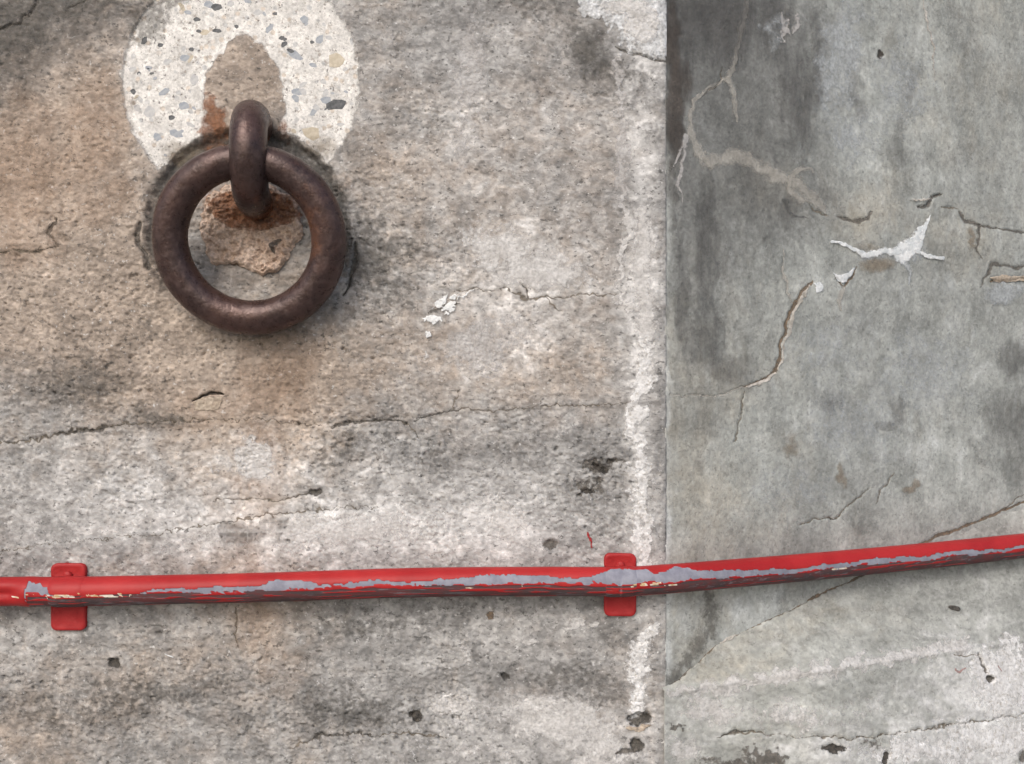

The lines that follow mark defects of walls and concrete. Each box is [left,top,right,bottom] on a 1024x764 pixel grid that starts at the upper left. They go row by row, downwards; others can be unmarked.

water stain [666,0,752,153]
rust [201,97,229,151]
crack [673,0,873,224]
crack [959,211,1024,259]
crack [454,282,619,311]
crack [672,249,813,442]
crack [0,389,626,444]
crack [800,474,894,525]
crack [918,495,1024,544]
crack [676,575,864,681]
crack [953,653,994,683]